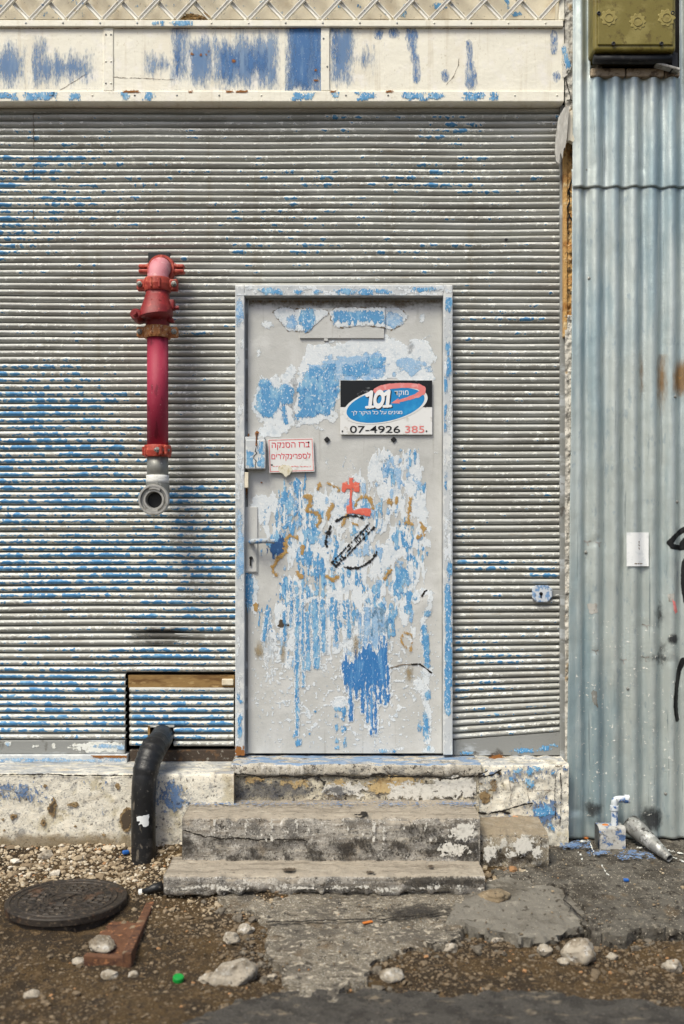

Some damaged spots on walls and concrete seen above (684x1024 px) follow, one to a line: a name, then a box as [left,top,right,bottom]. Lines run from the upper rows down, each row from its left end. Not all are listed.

peeling [0,92,81,101]
peeling [292,92,316,101]
peeling [355,92,376,101]
peeling [401,92,443,101]
peeling [461,92,499,101]
rust [660,365,684,392]
peeling [0,109,574,832]
crack [235,769,562,826]
crack [183,830,308,842]